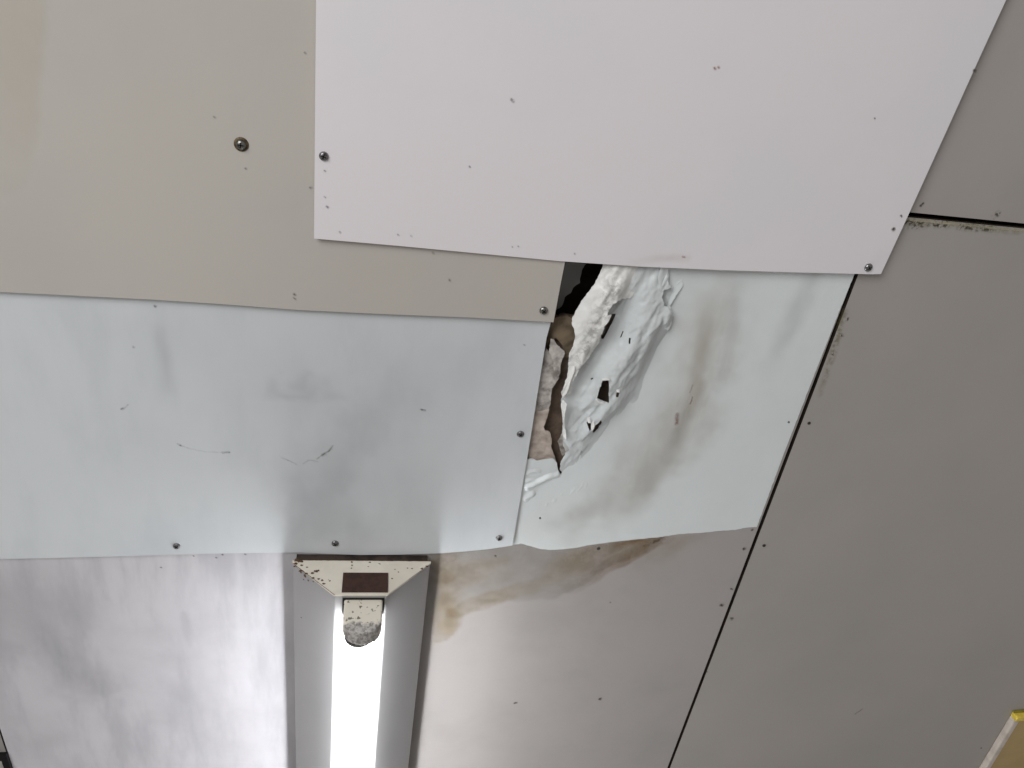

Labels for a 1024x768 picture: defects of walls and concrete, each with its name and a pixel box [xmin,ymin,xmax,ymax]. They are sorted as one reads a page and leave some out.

spalling [528,264,639,474]